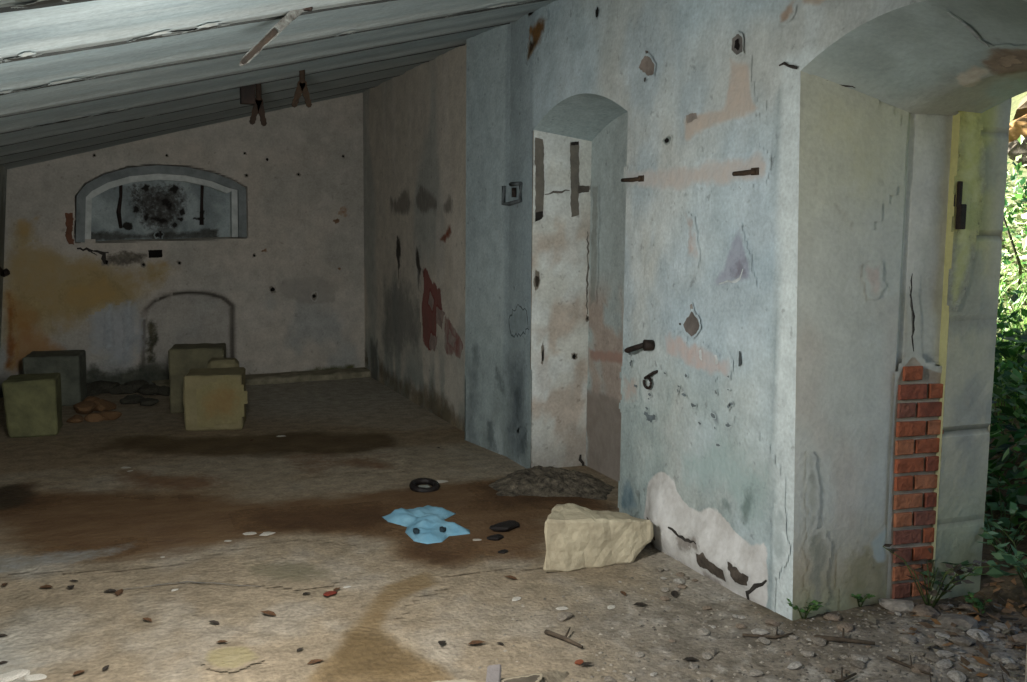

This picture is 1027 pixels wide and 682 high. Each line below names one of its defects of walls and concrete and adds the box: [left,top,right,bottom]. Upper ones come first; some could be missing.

spalling [950,43,1027,89]
peeling [420,264,465,363]
crack [908,273,916,352]
leakage [0,165,640,682]
spalling [868,351,944,600]